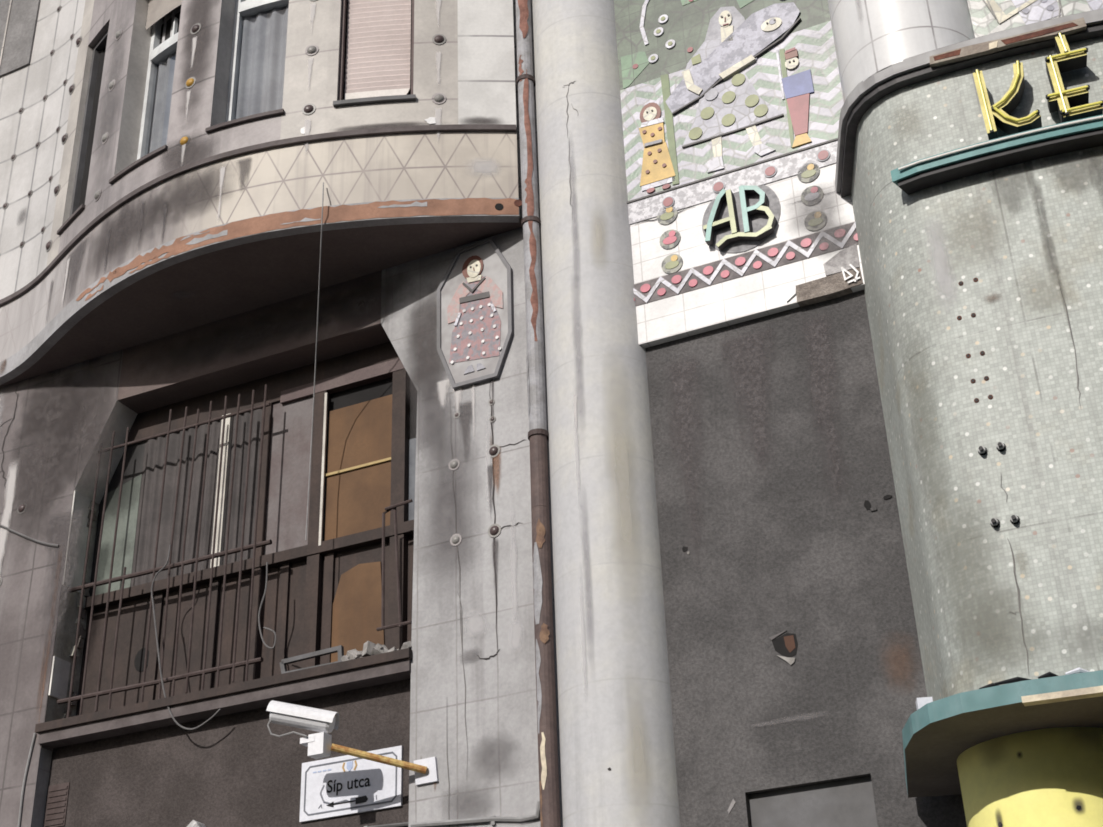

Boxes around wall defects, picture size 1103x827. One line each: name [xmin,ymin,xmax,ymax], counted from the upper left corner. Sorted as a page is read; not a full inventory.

corrosion [518,0,529,38]
damp [238,158,250,186]
peeling [76,198,522,301]
corrosion [518,55,538,341]
crack [563,82,578,213]
damp [0,466,16,563]
hole [769,631,798,665]
crack [1007,538,1029,674]